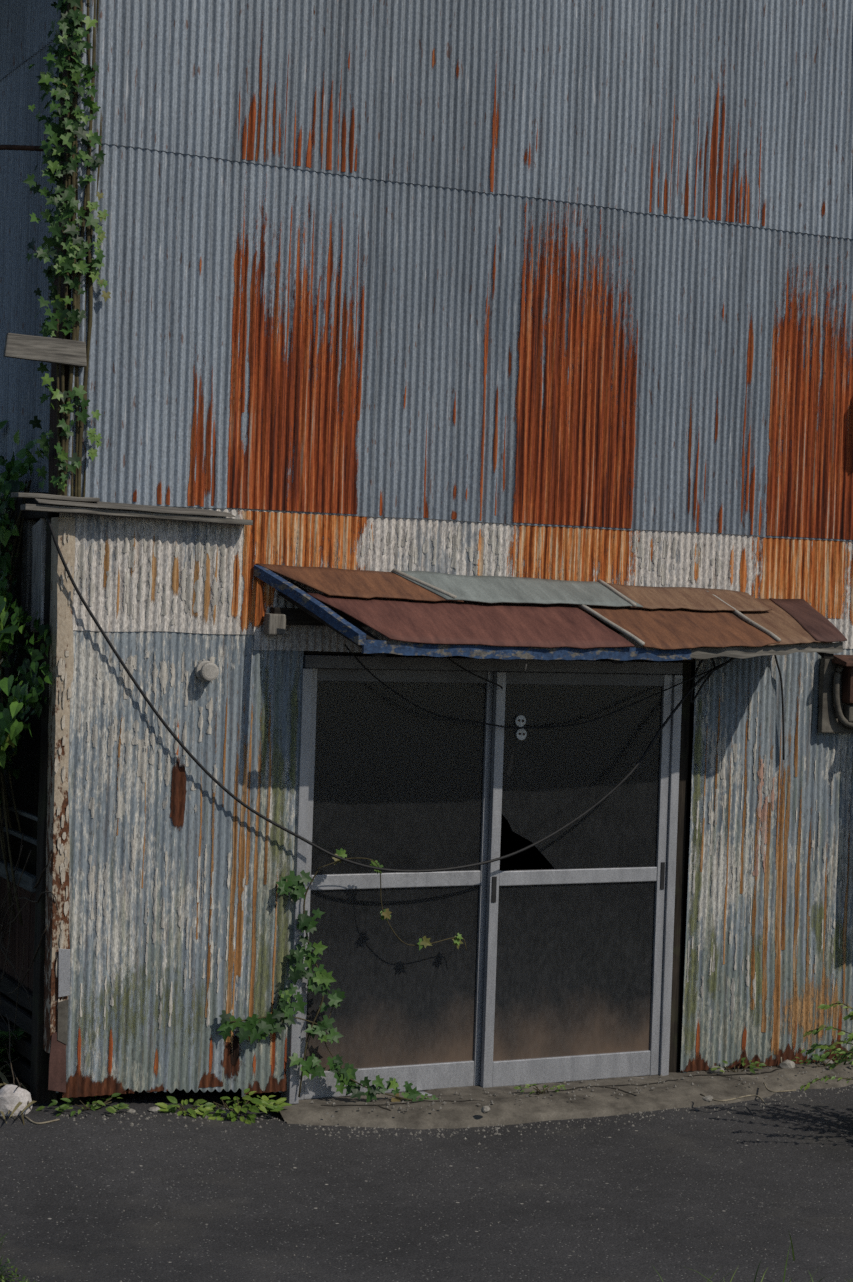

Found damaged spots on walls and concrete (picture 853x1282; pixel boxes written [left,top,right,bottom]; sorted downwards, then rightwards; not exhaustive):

corrosion [239,22,357,183]
corrosion [650,68,766,226]
corrosion [187,200,383,632]
corrosion [451,201,653,586]
corrosion [729,258,853,625]
peeling [54,651,72,782]
peeling [87,651,218,819]
peeling [54,804,114,1030]
peeling [130,826,245,1029]
corrosion [170,705,287,1094]
corrosion [684,674,850,1072]
corrosion [48,1000,168,1098]